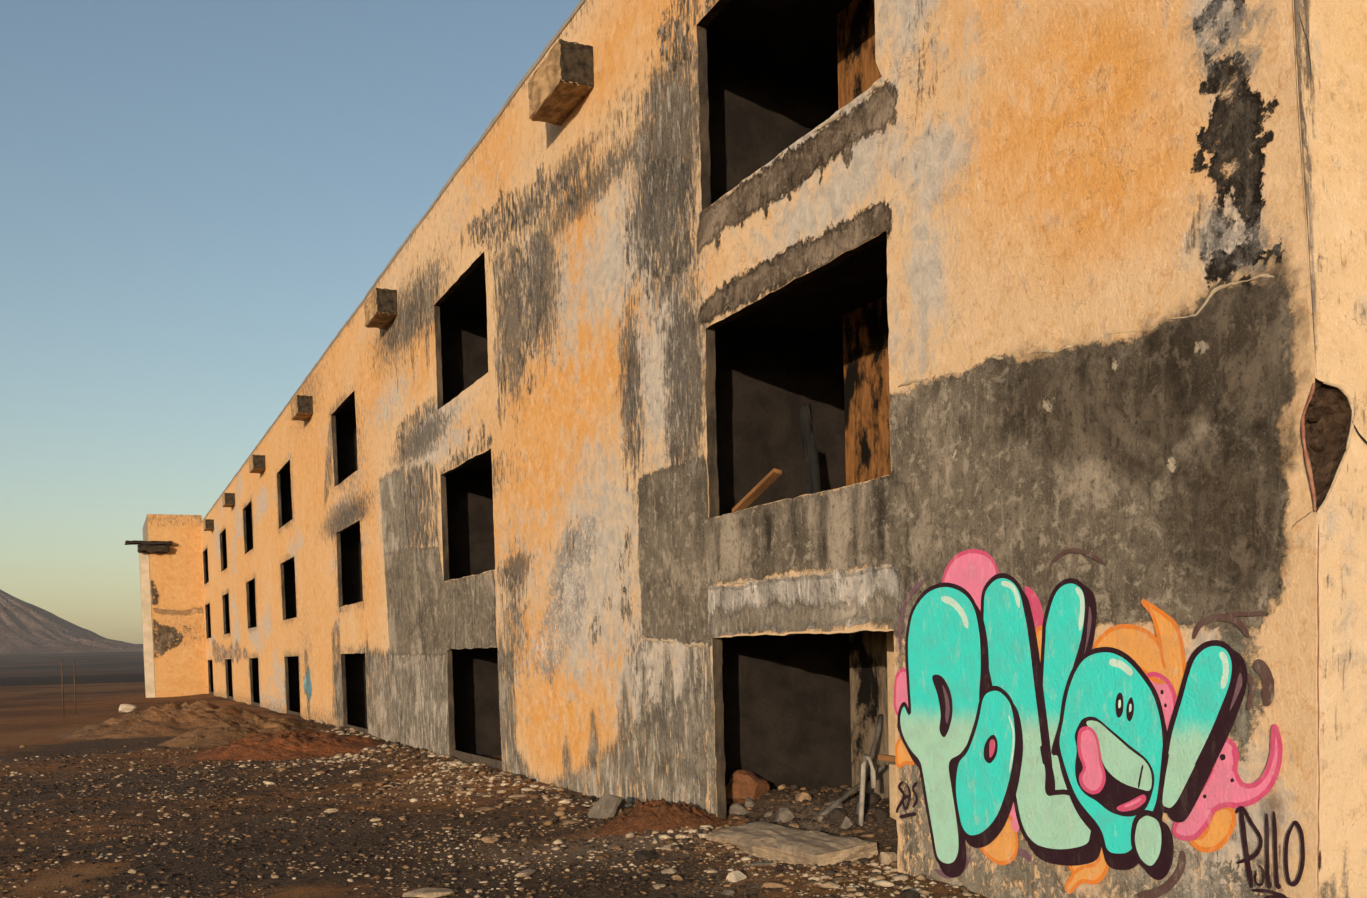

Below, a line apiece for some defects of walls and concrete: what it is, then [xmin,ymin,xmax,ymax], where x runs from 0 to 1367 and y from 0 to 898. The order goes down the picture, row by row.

peeling [588,0,1354,648]
damp [395,253,508,584]
damp [619,326,645,503]
damp [331,618,343,727]
damp [359,639,449,755]